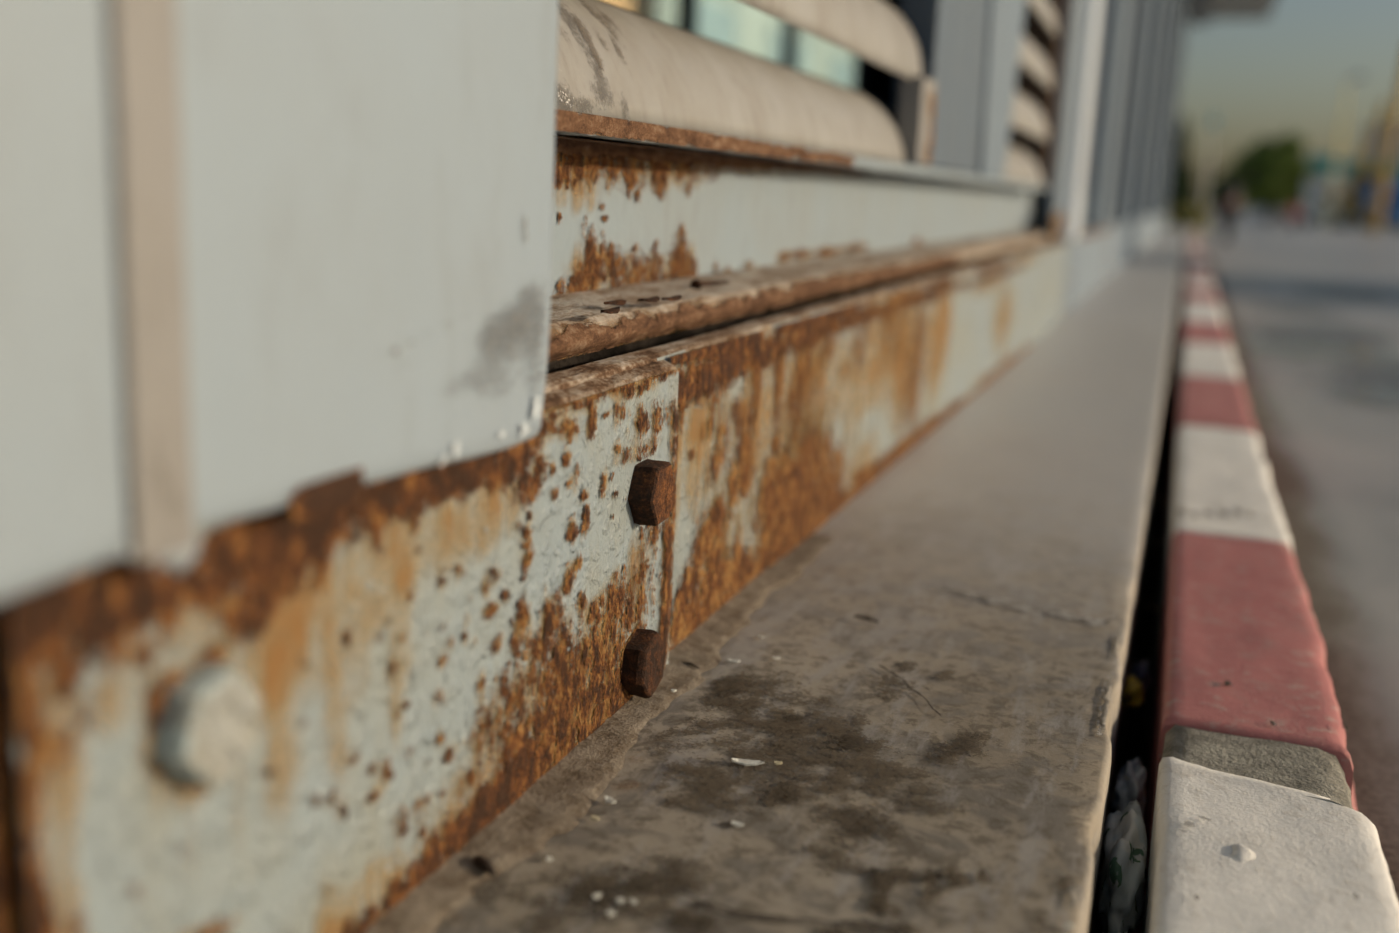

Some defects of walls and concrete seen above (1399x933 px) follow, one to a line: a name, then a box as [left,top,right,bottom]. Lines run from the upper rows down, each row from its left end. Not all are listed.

spalling [493,394,542,438]
rust [0,109,1038,933]
peeling [591,796,616,821]
leakage [546,861,725,933]
leakage [866,867,985,932]